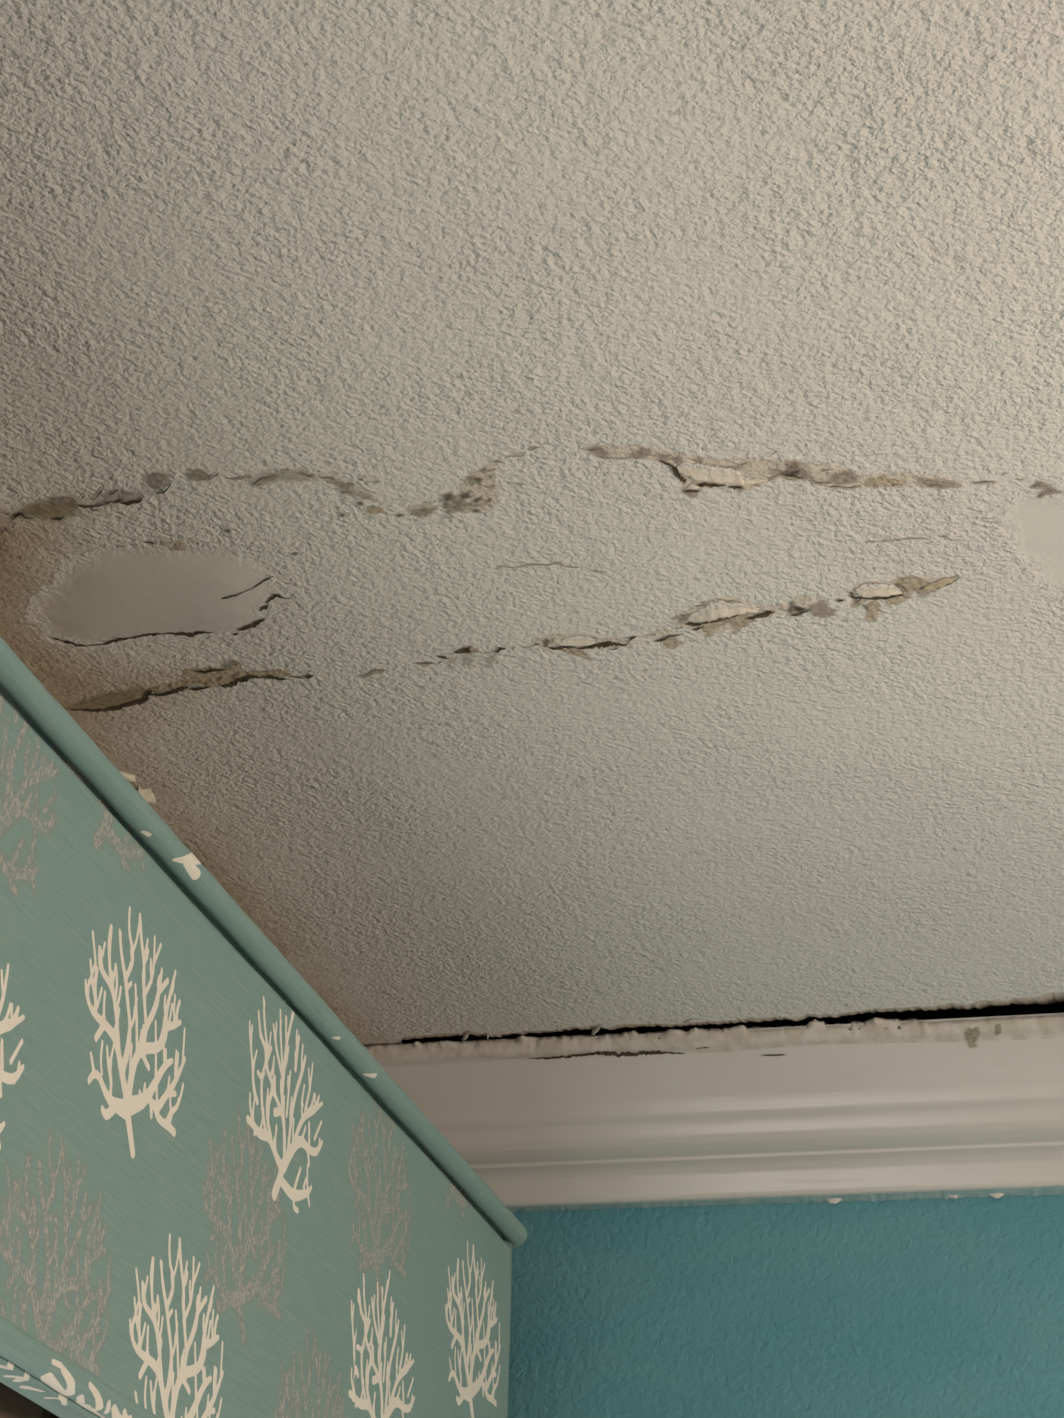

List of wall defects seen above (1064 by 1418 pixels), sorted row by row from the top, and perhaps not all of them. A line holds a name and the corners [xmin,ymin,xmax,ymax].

peeling [1,447,539,535]
peeling [581,445,1061,498]
peeling [416,576,958,667]
crack [364,992,1064,1061]